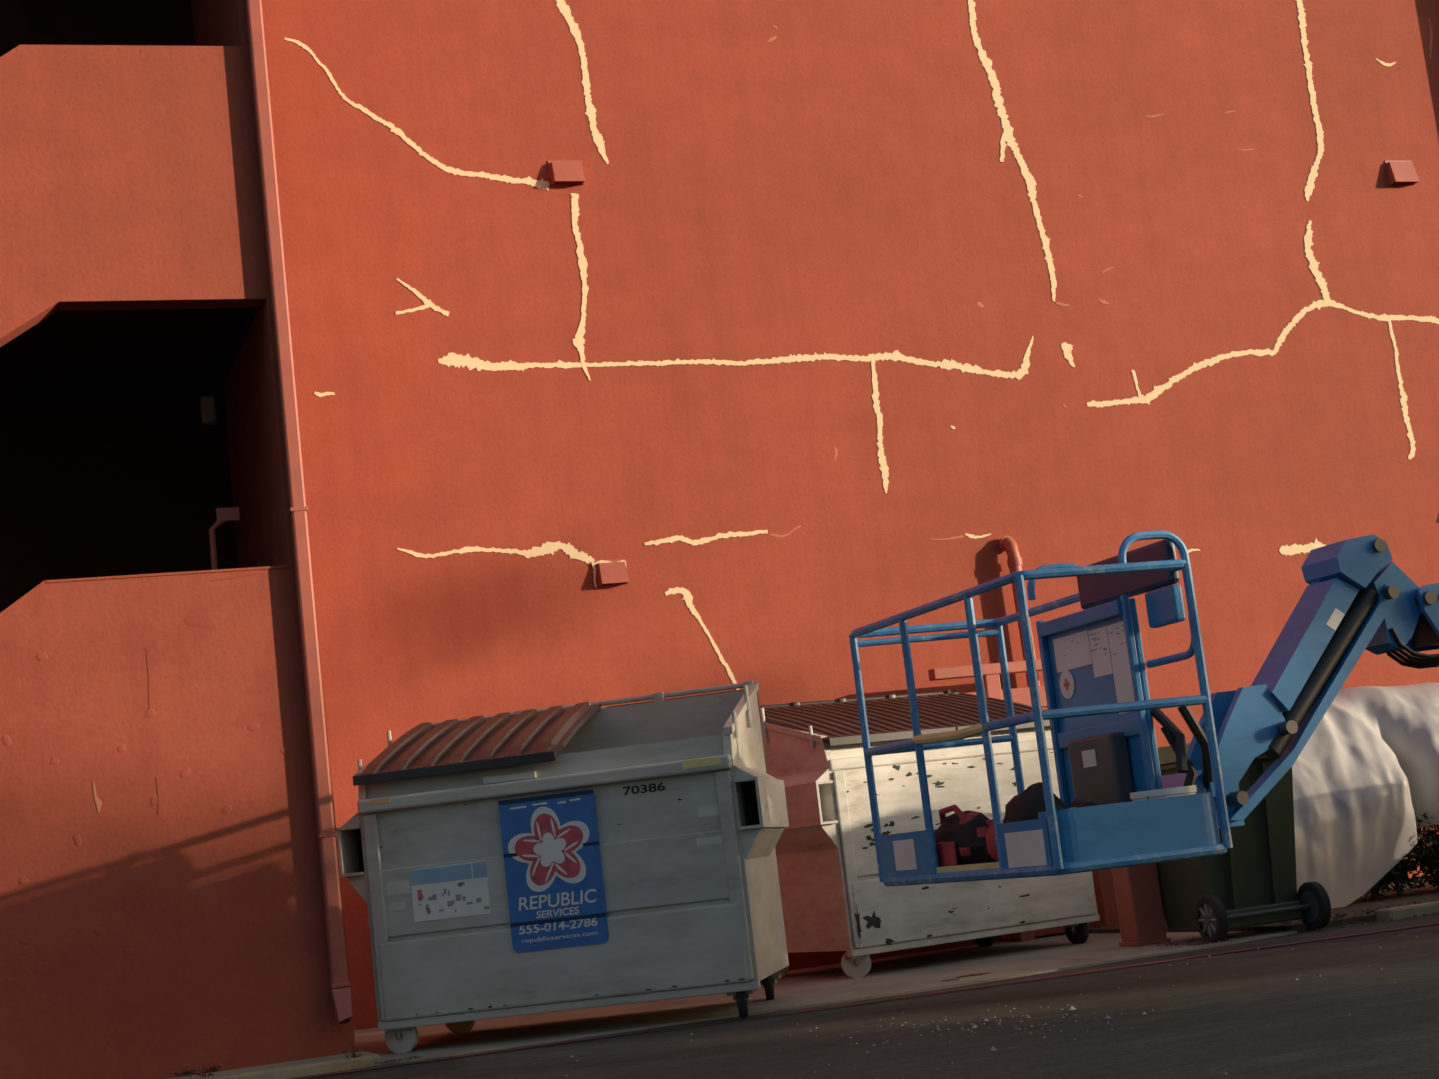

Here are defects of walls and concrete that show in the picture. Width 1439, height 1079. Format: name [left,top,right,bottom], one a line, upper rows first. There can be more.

crack [555,0,609,164]
crack [284,38,1034,493]
crack [967,0,1057,302]
crack [1087,0,1439,460]
crack [397,525,801,588]
crack [665,587,740,690]